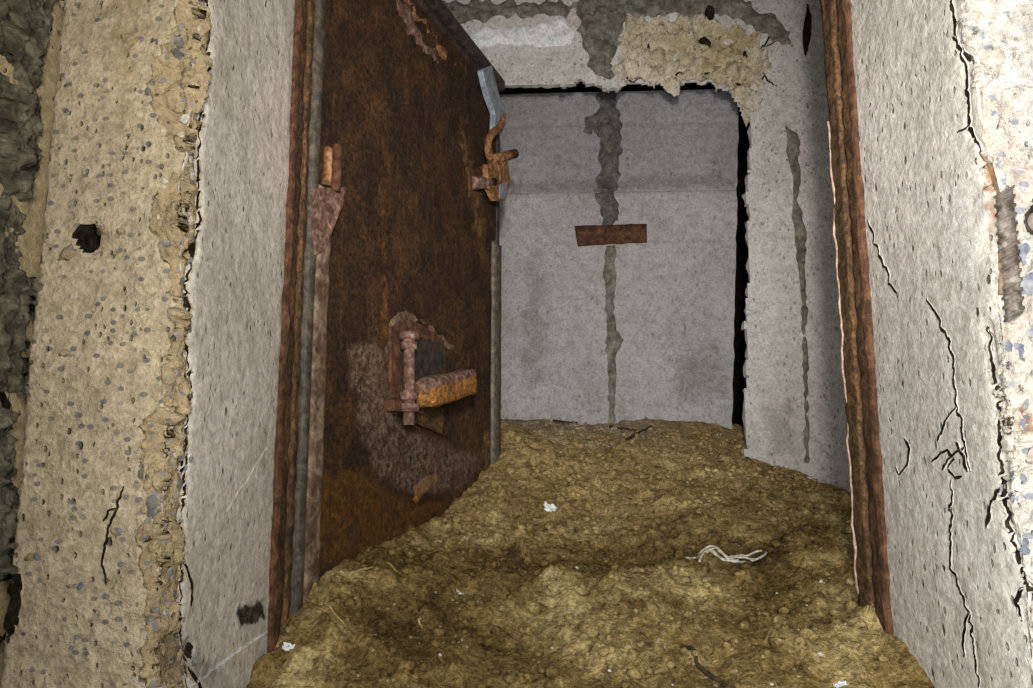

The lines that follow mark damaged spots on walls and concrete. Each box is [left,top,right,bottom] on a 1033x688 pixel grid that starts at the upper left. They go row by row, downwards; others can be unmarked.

flaking render [471,16,575,48]
spalling [611,5,771,126]
crack [949,0,989,171]
spalling [135,0,213,688]
crack [868,220,899,298]
crack [100,486,126,585]
crack [895,297,981,688]
crack [983,325,1033,622]